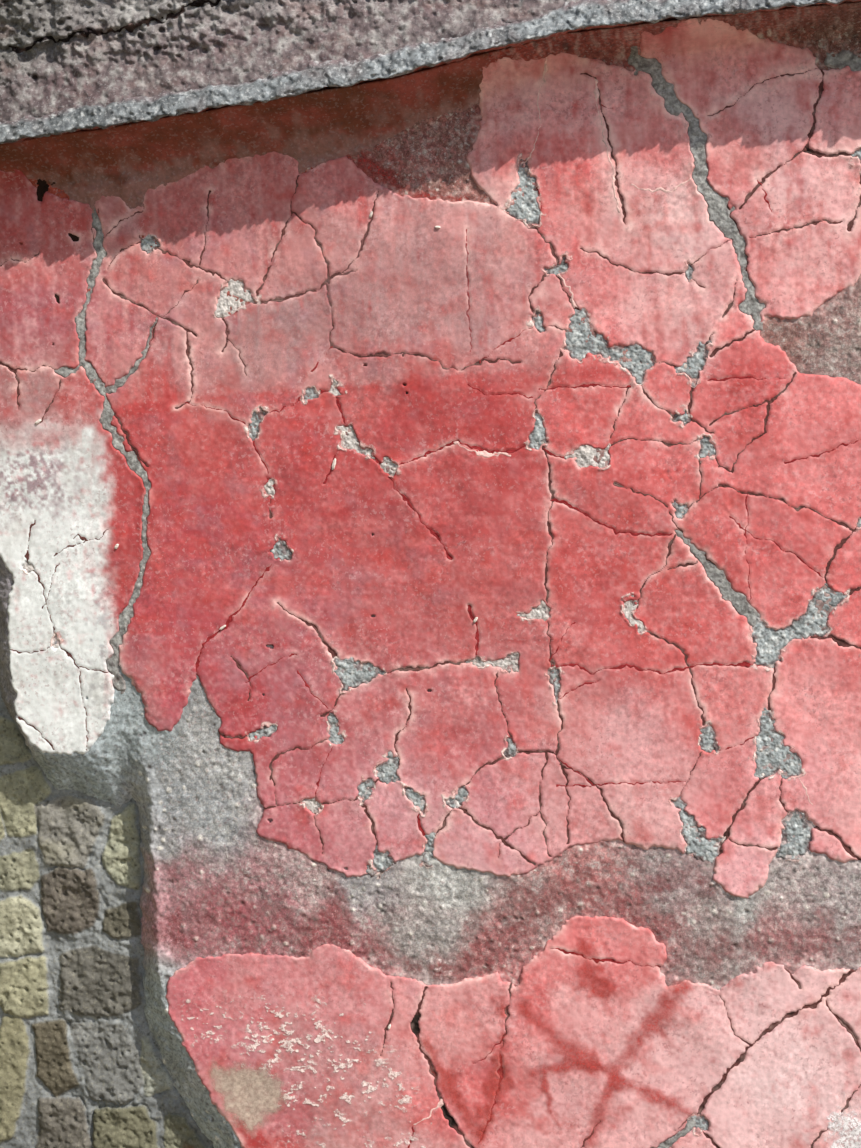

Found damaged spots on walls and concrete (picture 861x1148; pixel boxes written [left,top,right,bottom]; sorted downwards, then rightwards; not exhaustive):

crack [8,0,220,53]
peeling [764,296,861,383]
crack [0,46,861,865]
spalling [544,666,564,705]
peeling [154,689,861,984]
crack [550,948,661,967]
peeling [182,999,227,1046]
peeling [235,995,413,1129]
crack [380,982,512,1148]
crack [651,968,861,1148]
crack [582,1120,601,1147]
leakage [826,1110,861,1148]